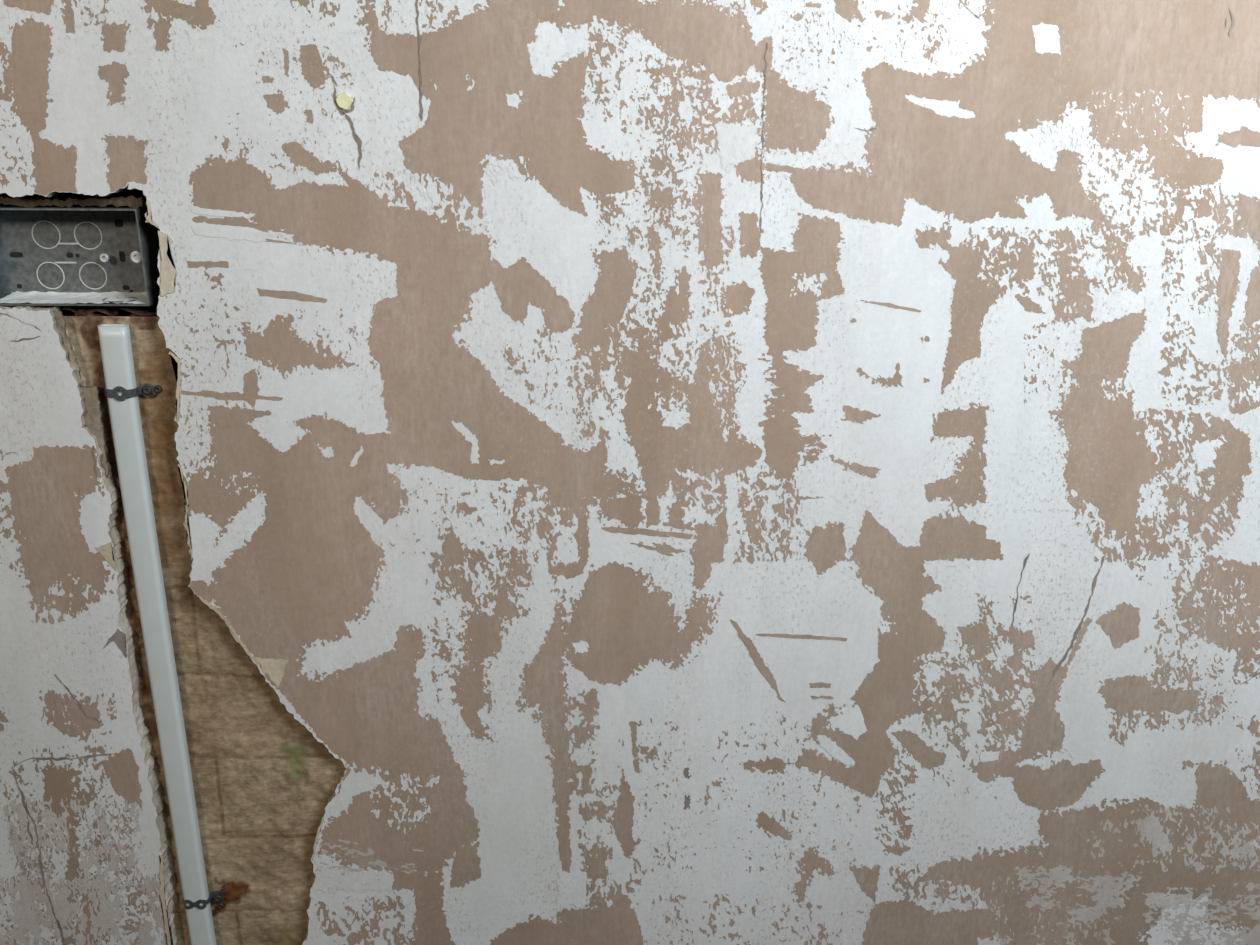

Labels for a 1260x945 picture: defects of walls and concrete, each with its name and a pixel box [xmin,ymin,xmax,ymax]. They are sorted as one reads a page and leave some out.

peeling [141,0,220,52]
peeling [1216,126,1260,148]
peeling [860,300,921,313]
peeling [856,363,903,388]
peeling [841,405,881,424]
peeling [0,444,116,624]
peeling [730,619,847,703]
peeling [619,720,672,775]
peeling [0,689,173,945]
peeling [684,777,737,825]
peeling [750,778,842,945]
peeling [663,894,764,945]